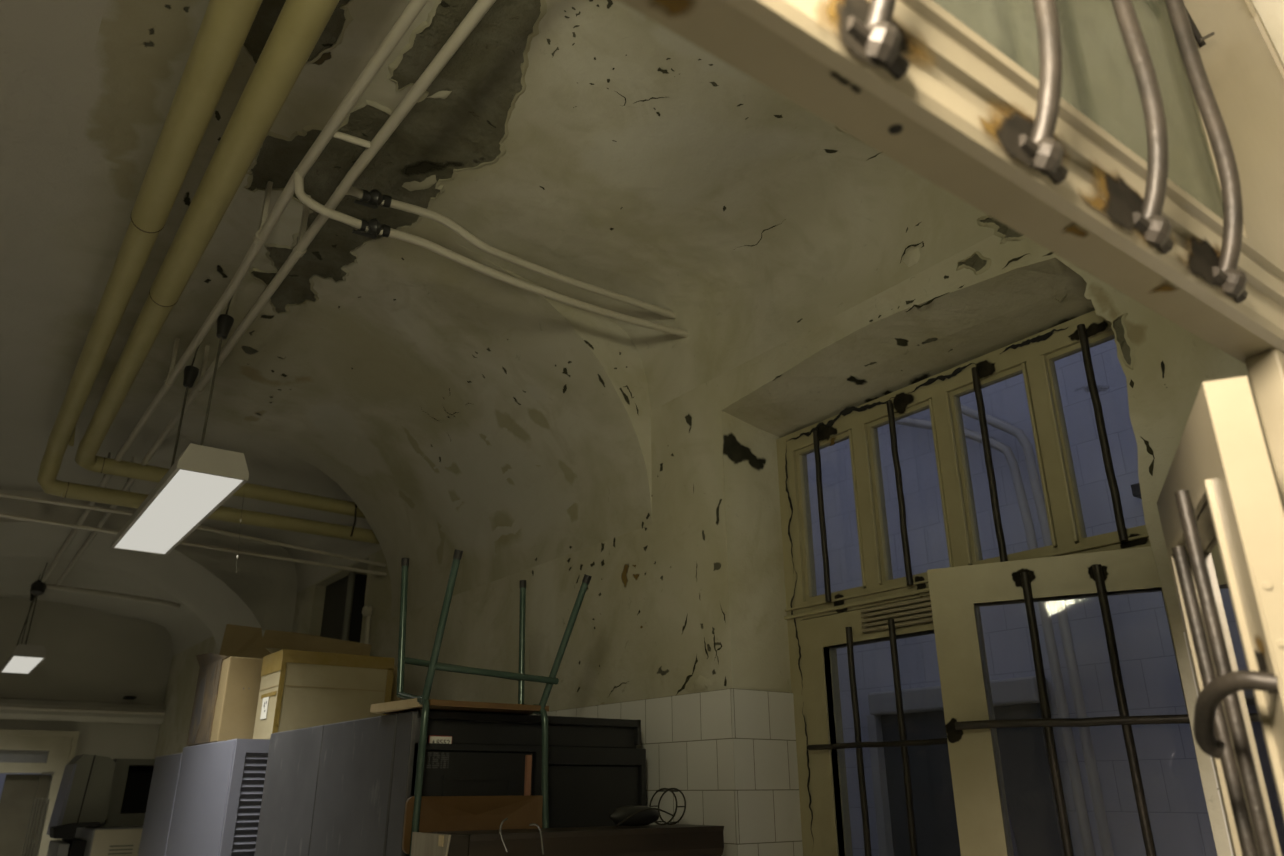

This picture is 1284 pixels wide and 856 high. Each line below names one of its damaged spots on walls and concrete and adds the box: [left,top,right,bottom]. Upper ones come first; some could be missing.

corrosion [651,0,694,16]
corrosion [823,0,878,65]
corrosion [891,20,930,62]
corrosion [980,108,1035,168]
peeling [241,0,613,354]
corrosion [1082,168,1144,234]
crack [785,327,1068,851]
crack [676,562,726,695]